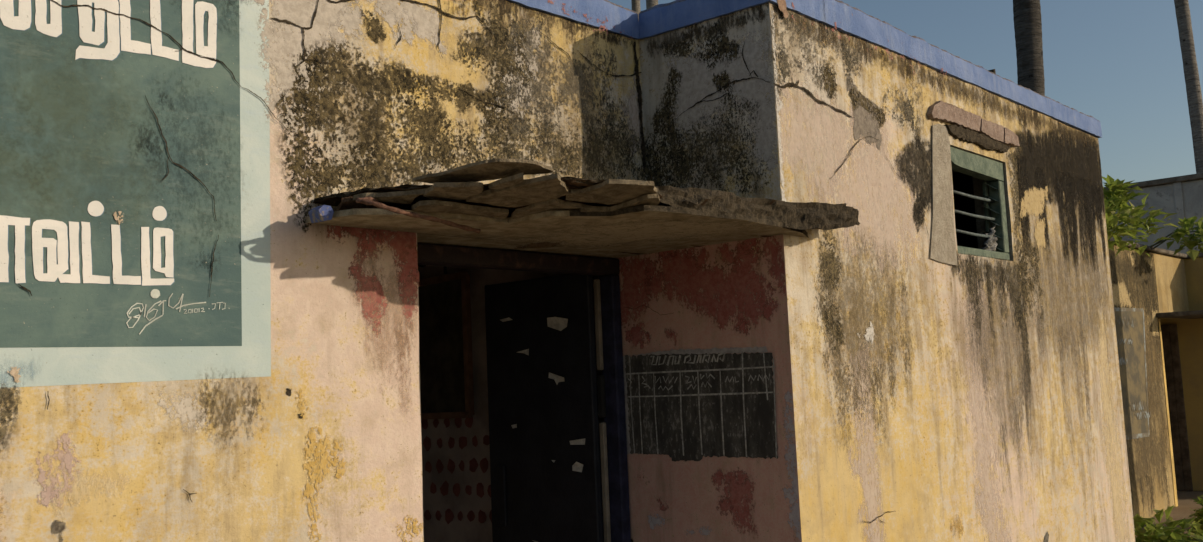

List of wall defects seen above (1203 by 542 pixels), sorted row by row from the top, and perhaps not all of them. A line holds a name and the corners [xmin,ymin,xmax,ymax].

crack [538,30,642,77]
water stain [276,0,941,232]
peeling [624,71,643,155]
crack [670,22,901,180]
peeling [667,0,932,271]
spalling [308,158,660,336]
peeling [619,236,786,349]
water stain [818,230,912,439]
water stain [951,105,1170,516]
water stain [0,380,21,448]
peeling [712,468,757,535]